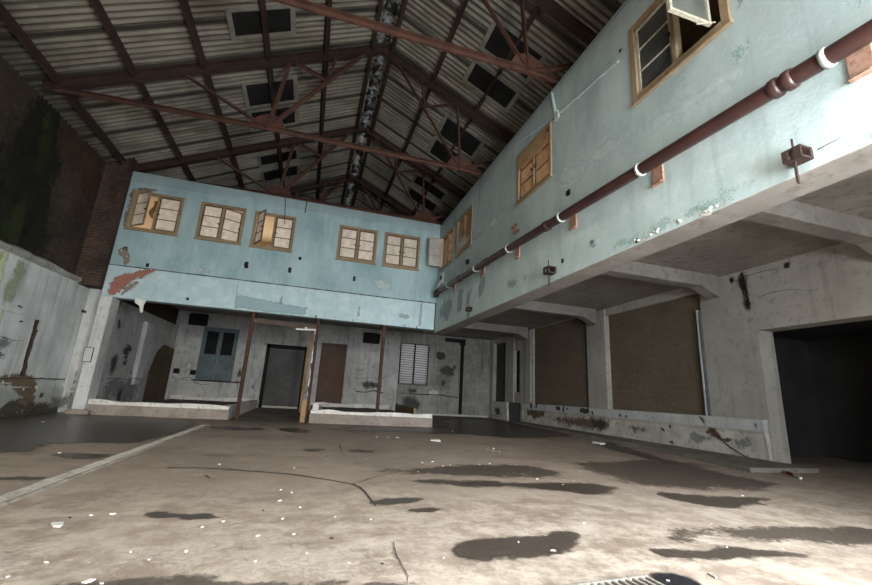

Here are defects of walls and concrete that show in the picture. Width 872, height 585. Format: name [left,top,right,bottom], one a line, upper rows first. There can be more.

water stain [0,96,63,322]
peeling [107,247,154,313]
water stain [729,268,778,310]
mould [437,351,456,386]
flaking render [0,372,48,414]
crack [168,467,397,506]
water stain [384,442,779,508]